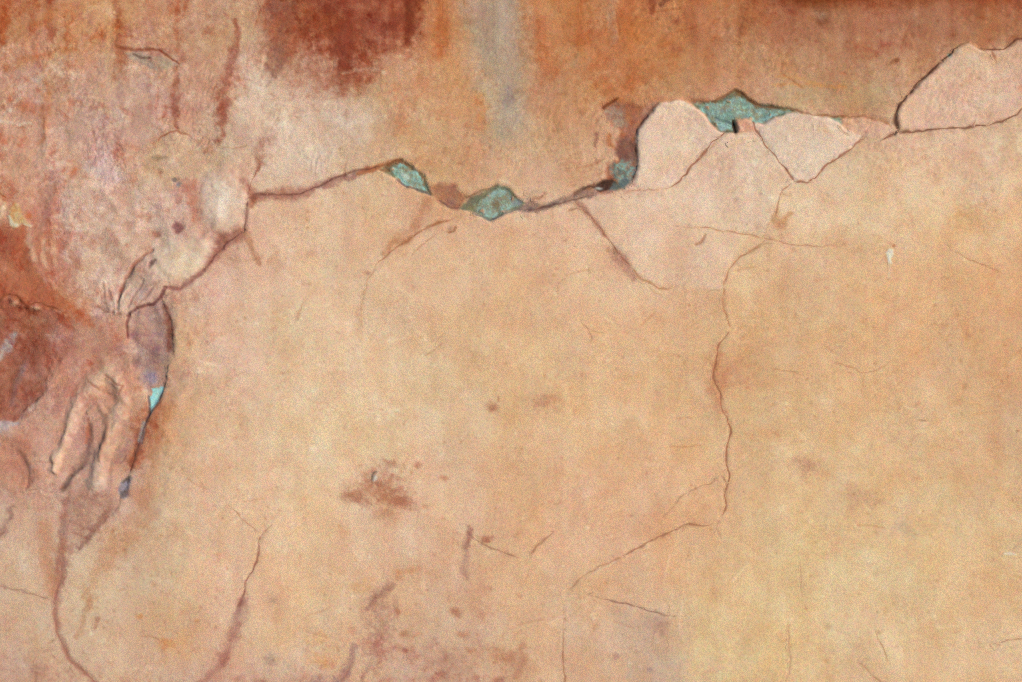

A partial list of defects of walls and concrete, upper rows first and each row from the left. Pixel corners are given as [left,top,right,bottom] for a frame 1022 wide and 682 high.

corrosion [209,0,428,140]
corrosion [532,0,1022,104]
peeling [377,41,1022,295]
water stain [22,221,68,300]
spalling [49,129,230,445]
crack [520,185,681,298]
spalling [0,296,82,427]
crack [556,36,1022,682]
spalling [116,473,133,501]
crack [0,558,98,682]